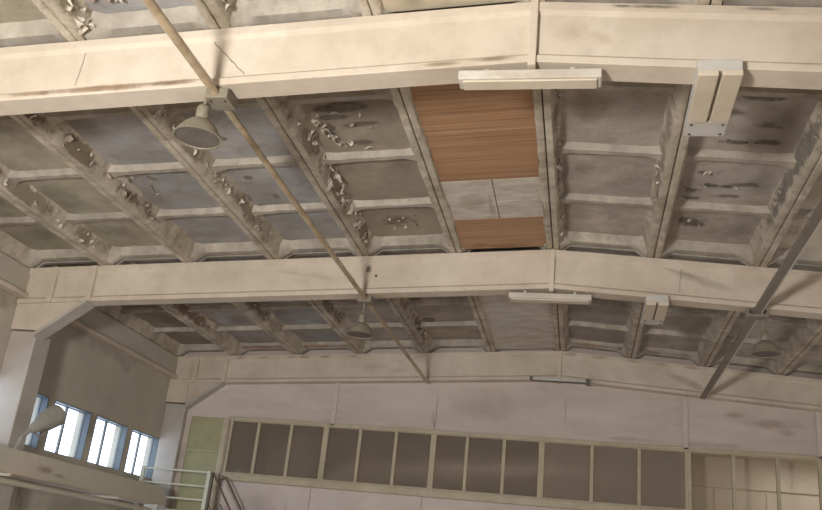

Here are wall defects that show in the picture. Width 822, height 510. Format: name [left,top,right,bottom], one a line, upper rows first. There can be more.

peeling [60,0,95,35]
peeling [25,113,51,132]
peeling [60,128,94,167]
peeling [275,96,375,249]
peeling [3,177,63,228]
peeling [206,162,271,241]